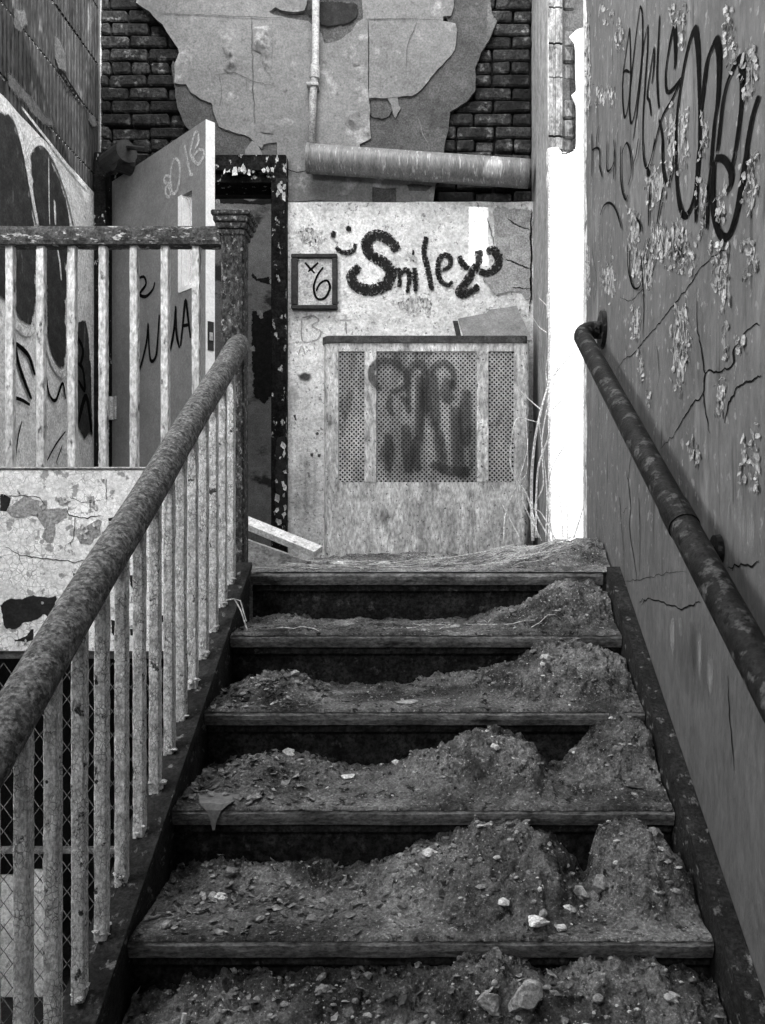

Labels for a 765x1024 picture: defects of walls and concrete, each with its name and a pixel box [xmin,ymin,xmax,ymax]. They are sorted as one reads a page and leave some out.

flaking render [271,0,363,43]
peeling [668,3,689,51]
peeling [721,4,759,102]
flaking render [101,0,287,205]
flaking render [360,0,533,300]
peeling [625,101,759,408]
crack [592,248,761,447]
peeling [0,490,70,543]
peeling [76,496,113,544]
crack [619,460,701,610]
crack [727,561,759,571]
peeling [0,595,58,646]